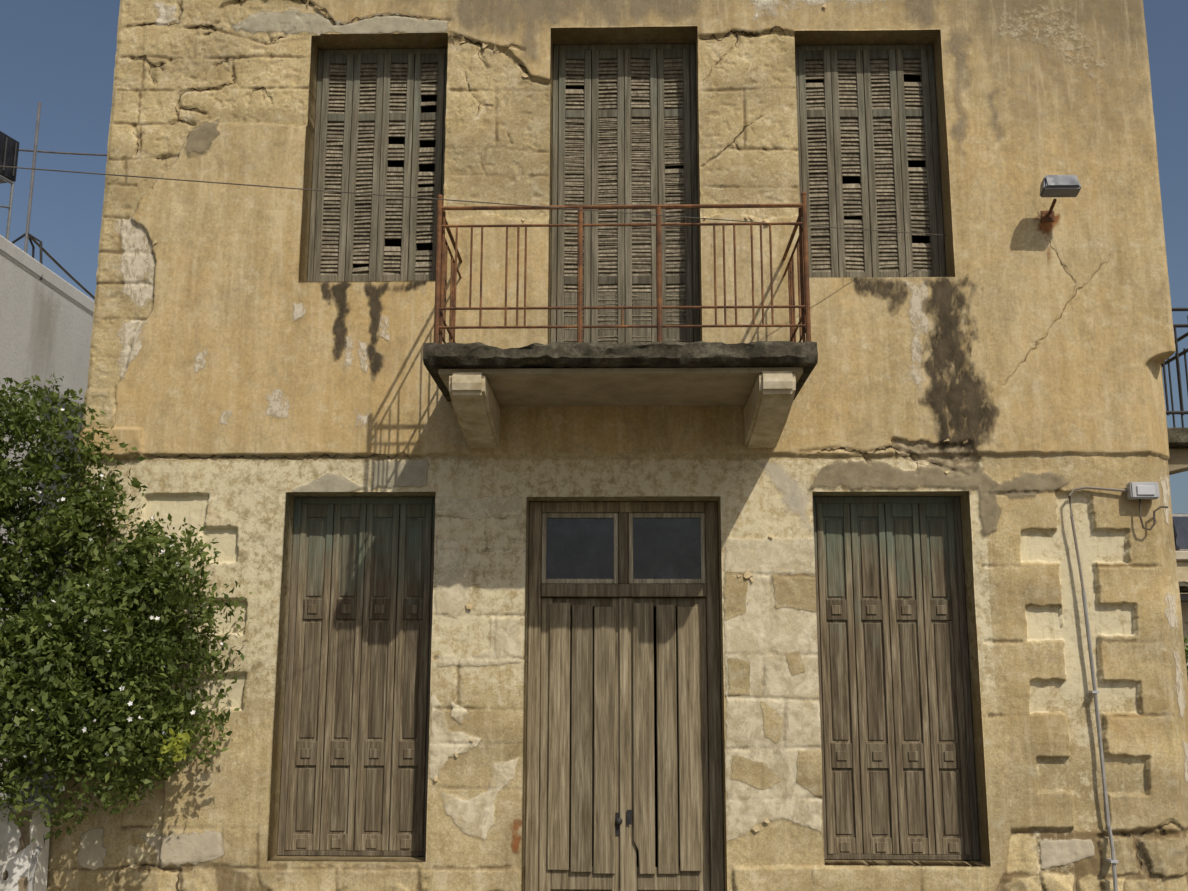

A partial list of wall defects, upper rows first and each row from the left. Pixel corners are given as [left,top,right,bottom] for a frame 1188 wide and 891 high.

crack [127,6,217,34]
crack [131,55,272,126]
crack [292,0,547,115]
crack [701,26,791,83]
flaking render [82,0,334,429]
corrosion [1039,214,1060,233]
leakage [321,281,351,359]
leakage [365,280,427,375]
leakage [854,277,908,311]
leakage [922,277,998,451]
peeling [429,690,481,781]
peeling [444,758,519,839]